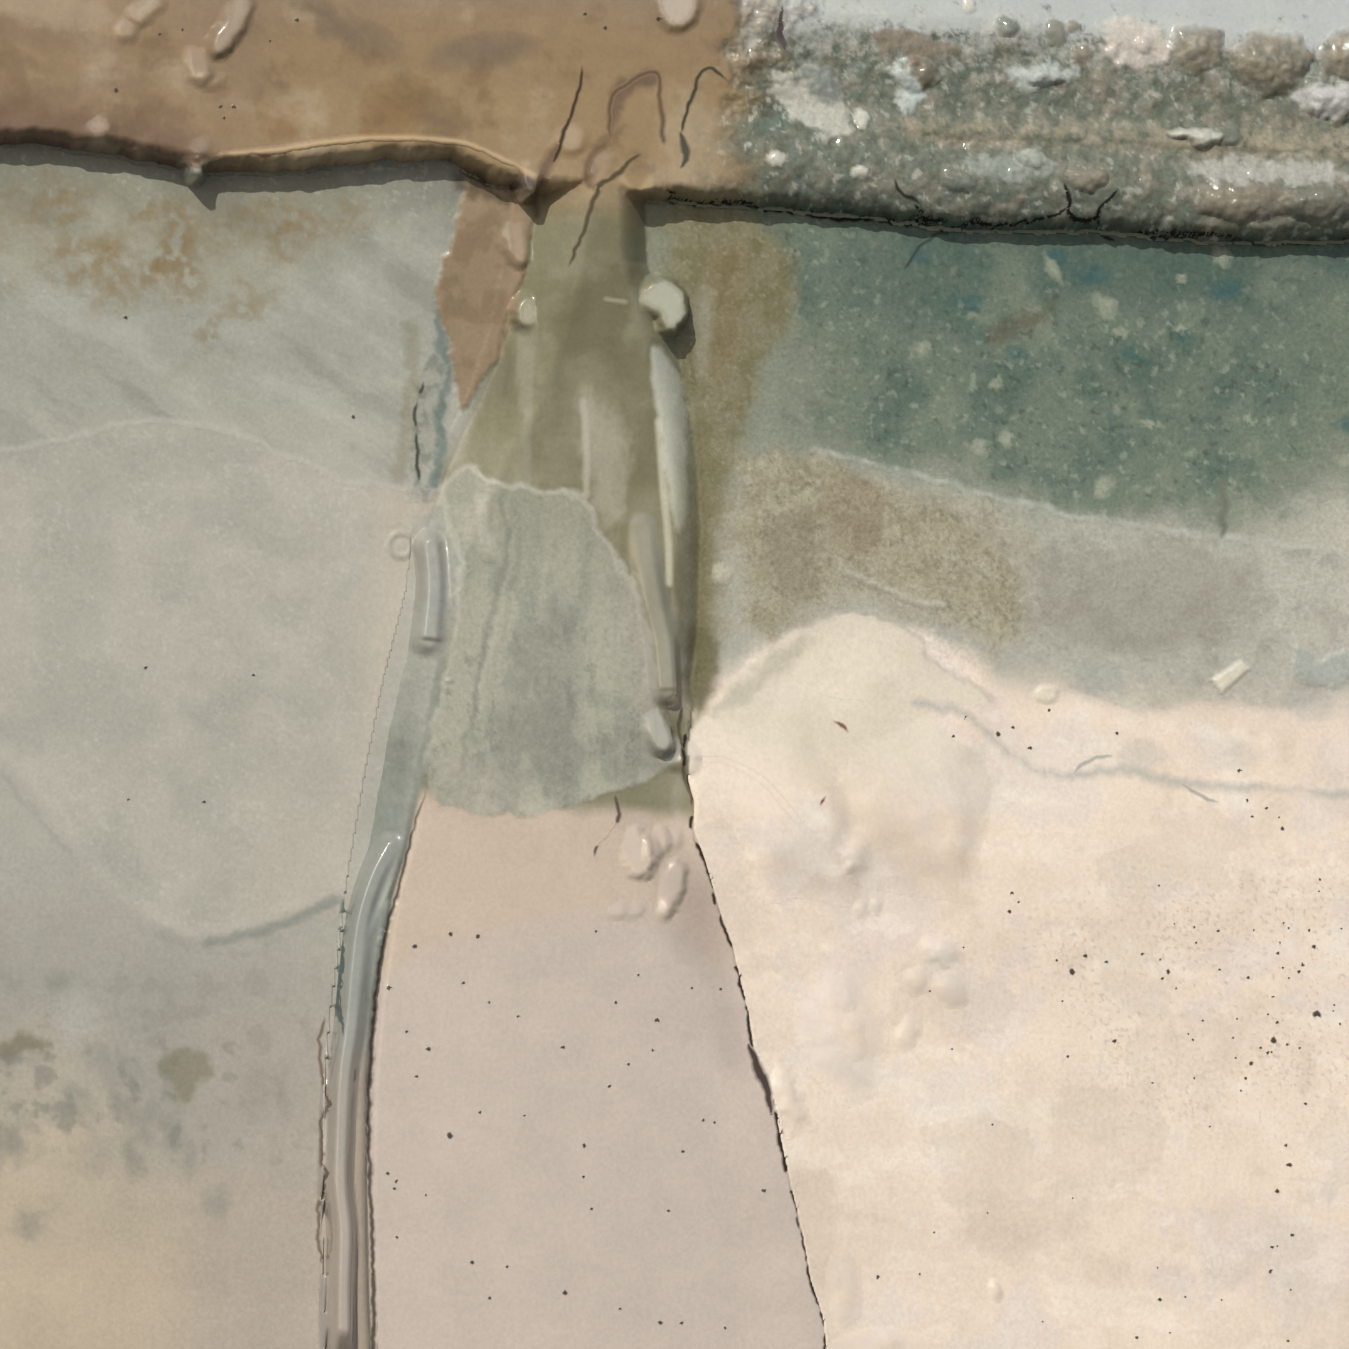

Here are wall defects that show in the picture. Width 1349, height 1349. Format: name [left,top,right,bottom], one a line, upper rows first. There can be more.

crack [526,63,1349,270]
crack [411,381,425,482]
crack [833,720,850,733]
damp [0,909,342,1227]
damp [356,1085,379,1144]
damp [364,963,391,1051]
crack [675,706,828,1349]
damp [0,1200,57,1247]